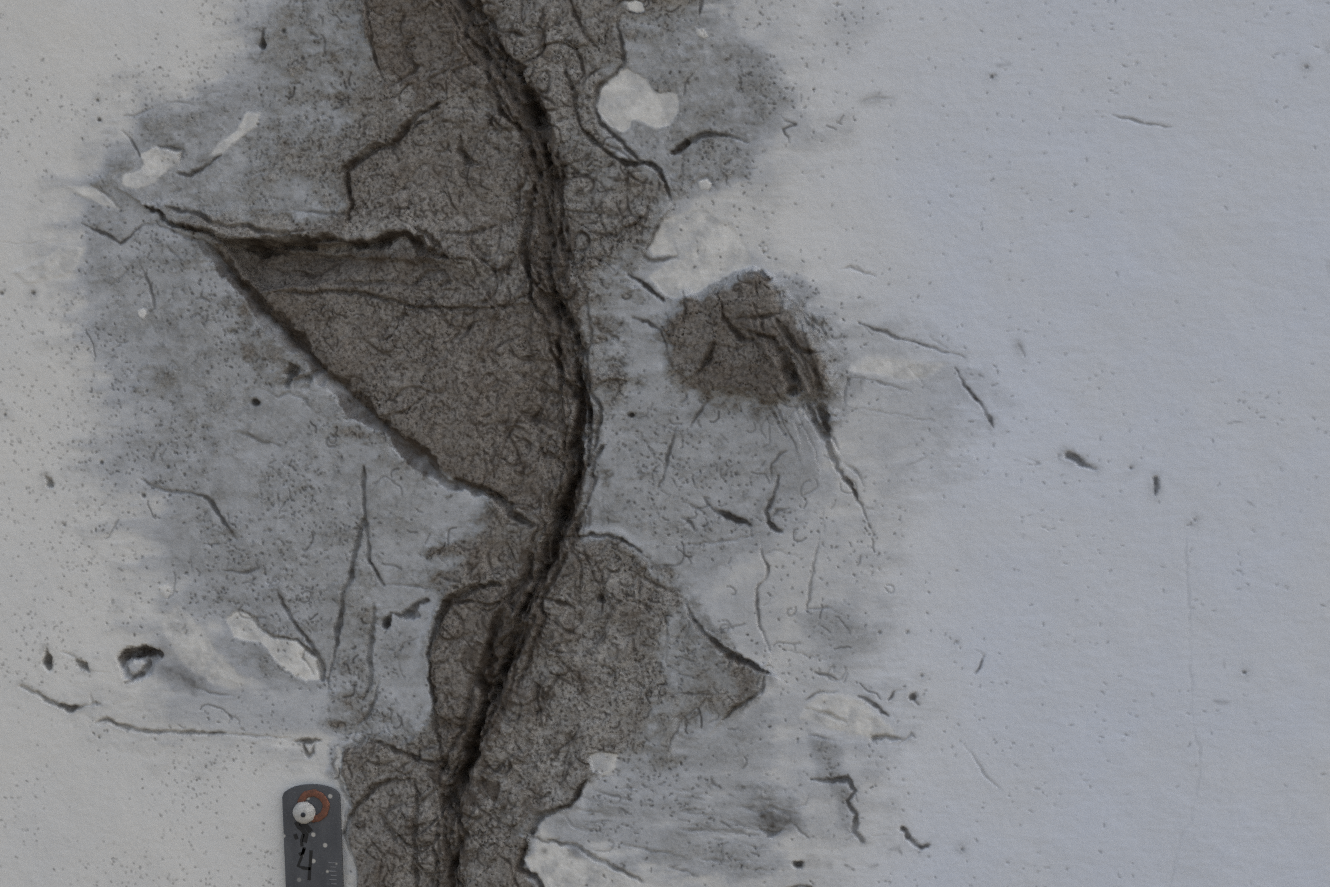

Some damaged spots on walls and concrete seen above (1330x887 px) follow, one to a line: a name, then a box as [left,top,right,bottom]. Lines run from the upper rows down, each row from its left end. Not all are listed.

peeling [70,187,116,209]
peeling [122,147,181,190]
spalling [169,0,531,303]
spalling [502,0,751,300]
crack [20,0,995,887]
spalling [474,499,524,572]
peeling [228,612,321,682]
spalling [334,553,494,887]
spalling [470,537,764,887]
crack [963,743,1003,792]
peeling [793,855,880,871]
peeling [871,827,931,856]